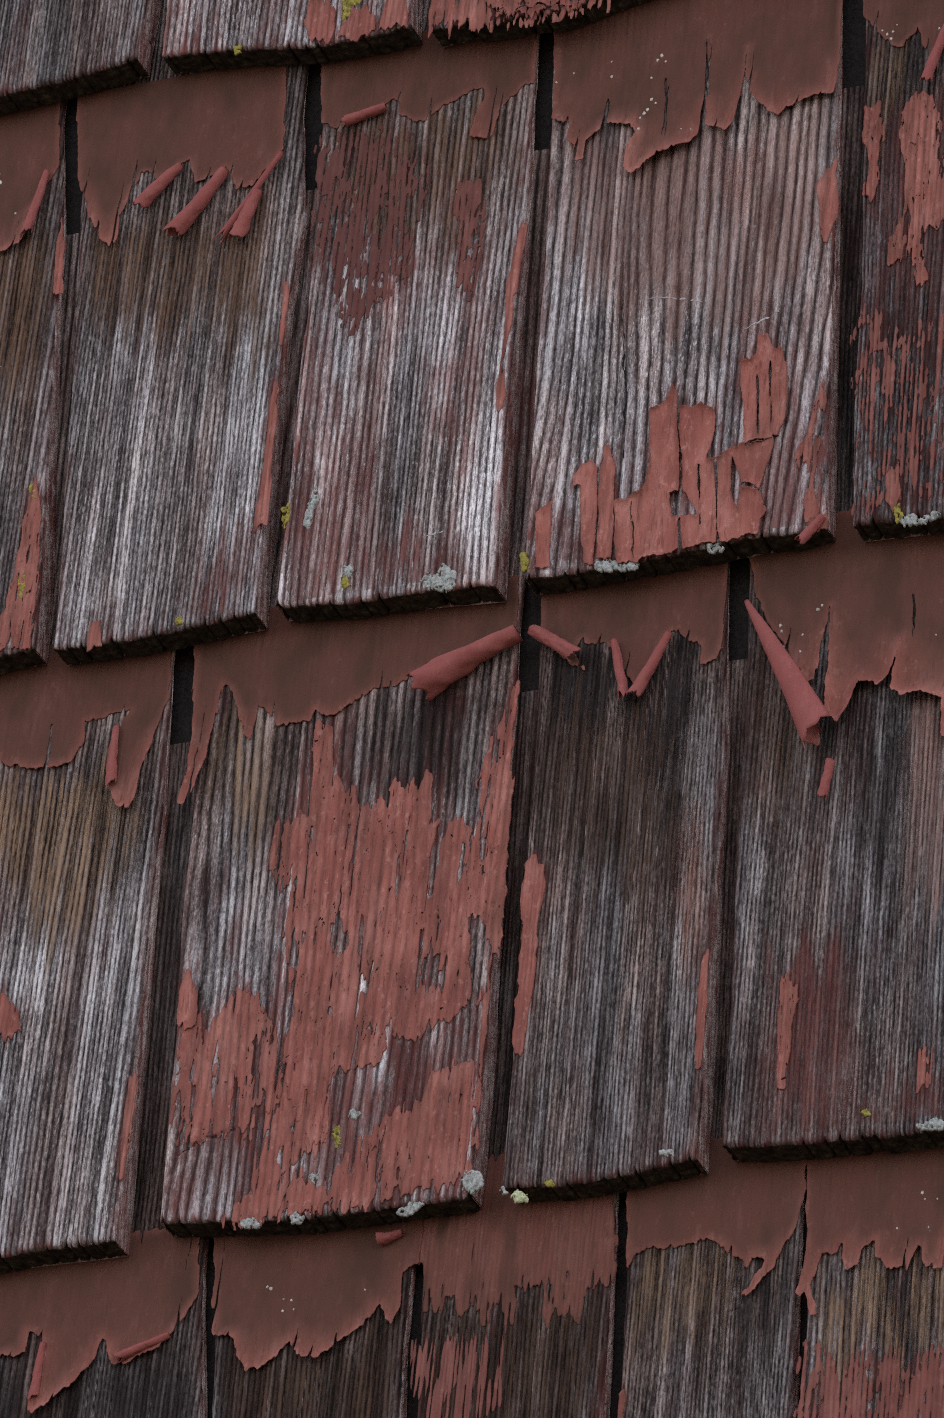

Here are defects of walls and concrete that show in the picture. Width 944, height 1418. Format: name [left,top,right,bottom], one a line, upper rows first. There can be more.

peeling [53,218,65,295]
peeling [0,65,287,252]
peeling [304,0,843,336]
peeling [862,0,944,288]
peeling [0,304,944,1418]